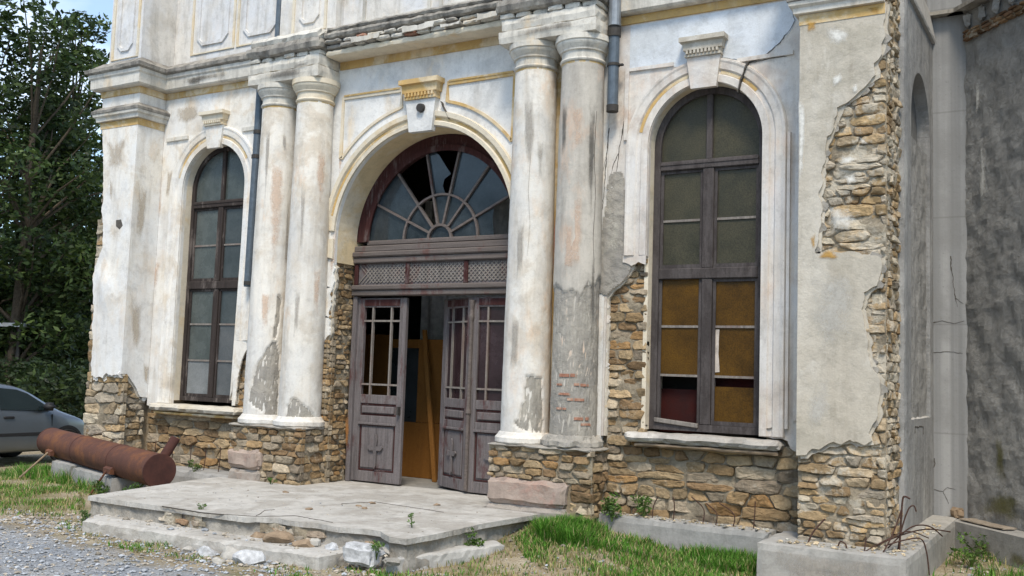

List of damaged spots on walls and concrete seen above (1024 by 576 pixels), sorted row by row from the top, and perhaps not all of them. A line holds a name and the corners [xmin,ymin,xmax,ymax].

crack [729,11,795,94]
flaking render [93,217,103,274]
flaking render [515,0,903,550]
crack [933,256,963,324]
flaking render [83,263,354,483]